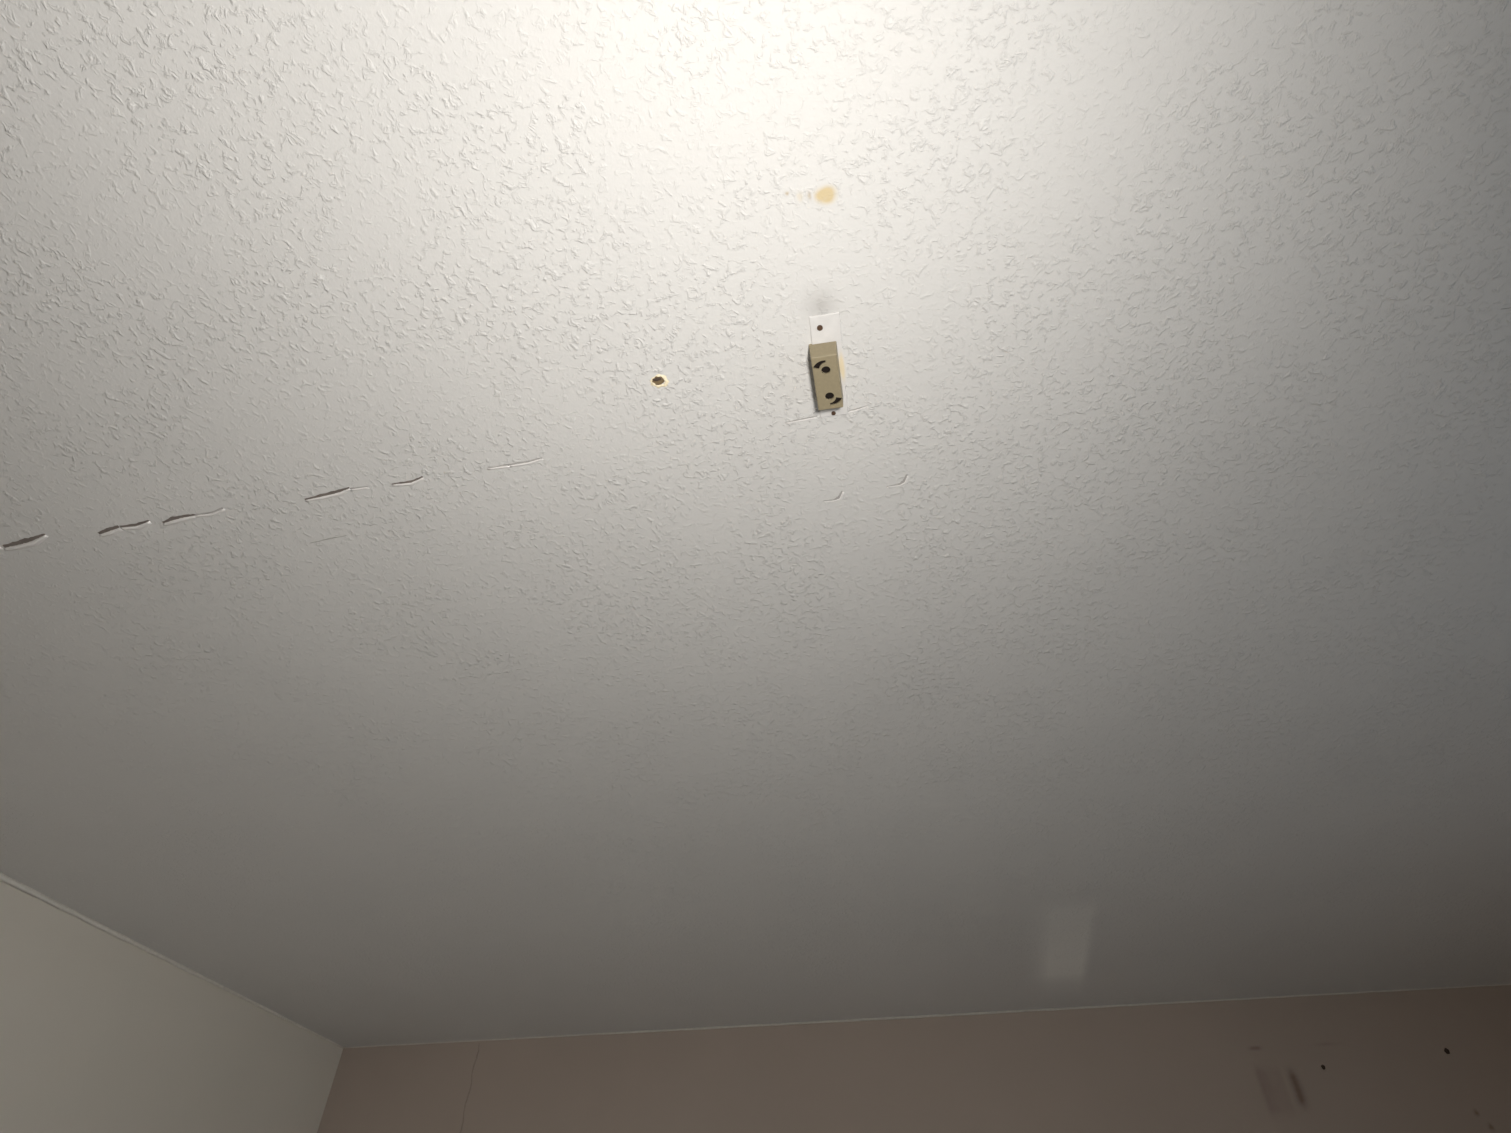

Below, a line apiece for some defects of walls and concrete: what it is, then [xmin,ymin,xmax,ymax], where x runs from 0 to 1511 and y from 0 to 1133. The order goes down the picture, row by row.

crack [487,457,544,470]
crack [305,476,425,502]
crack [98,507,226,537]
crack [0,534,48,551]